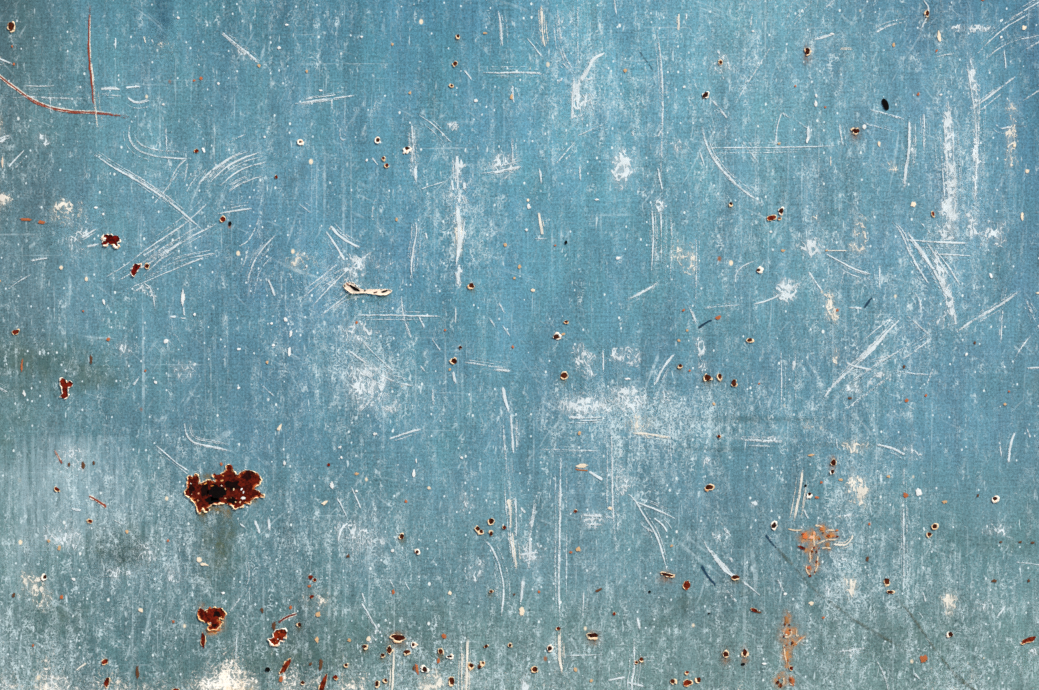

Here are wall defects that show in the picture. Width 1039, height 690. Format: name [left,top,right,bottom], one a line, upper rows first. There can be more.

corrosion [100,234,121,249]
peeling [343,282,392,296]
corrosion [59,377,73,400]
corrosion [184,463,265,515]
corrosion [789,525,839,577]
corrosion [197,607,227,634]
corrosion [267,621,287,647]
spalling [381,634,418,658]
corrosion [775,616,805,687]
peeling [1,649,78,690]
peeling [93,648,399,690]
peeling [670,671,701,687]